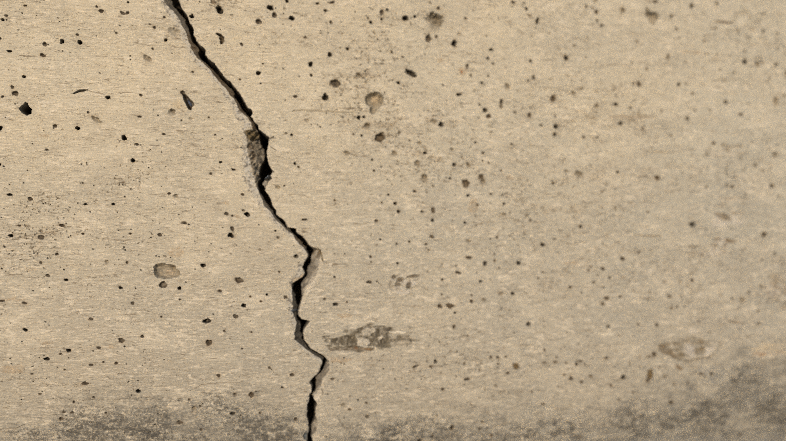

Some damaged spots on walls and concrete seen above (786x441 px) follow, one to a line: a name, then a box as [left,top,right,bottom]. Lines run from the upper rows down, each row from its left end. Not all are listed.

crack [159,0,331,441]